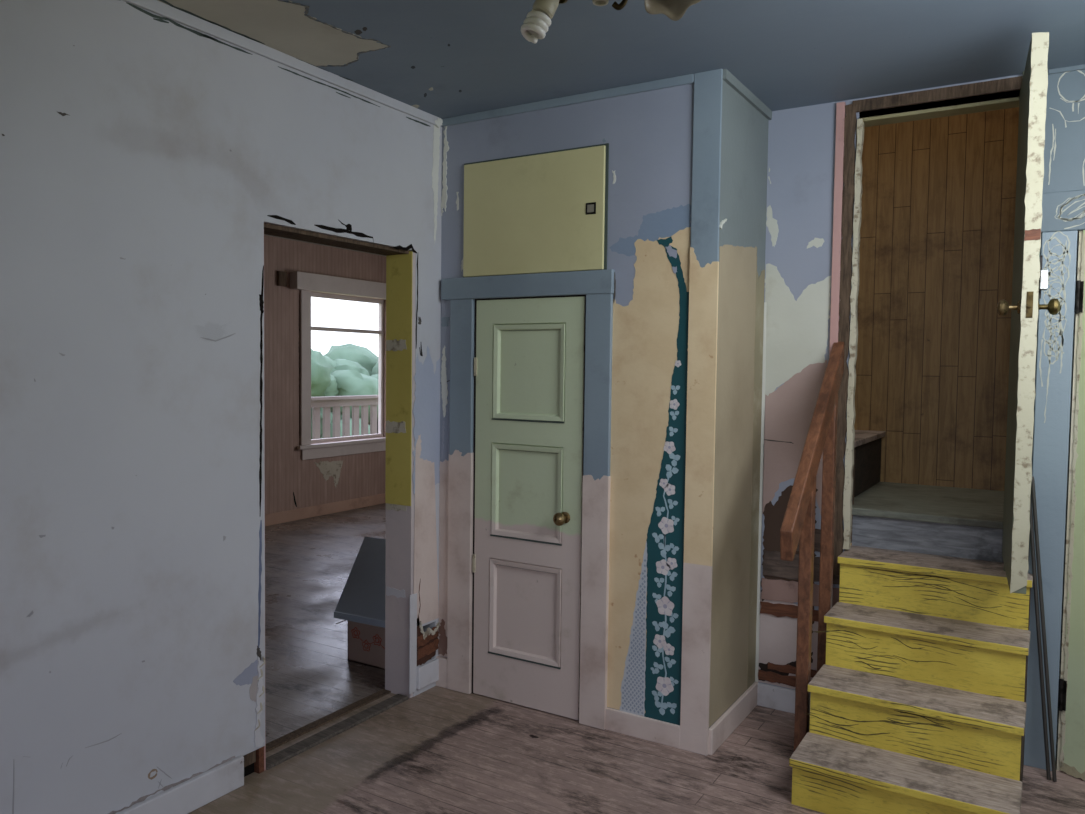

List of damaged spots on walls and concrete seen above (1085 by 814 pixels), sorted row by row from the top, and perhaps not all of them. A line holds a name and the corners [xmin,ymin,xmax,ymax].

peeling [157,0,391,67]
crack [267,215,423,356]
peeling [766,206,779,247]
peeling [385,346,449,666]
peeling [579,227,831,756]
flaking render [832,574,840,607]